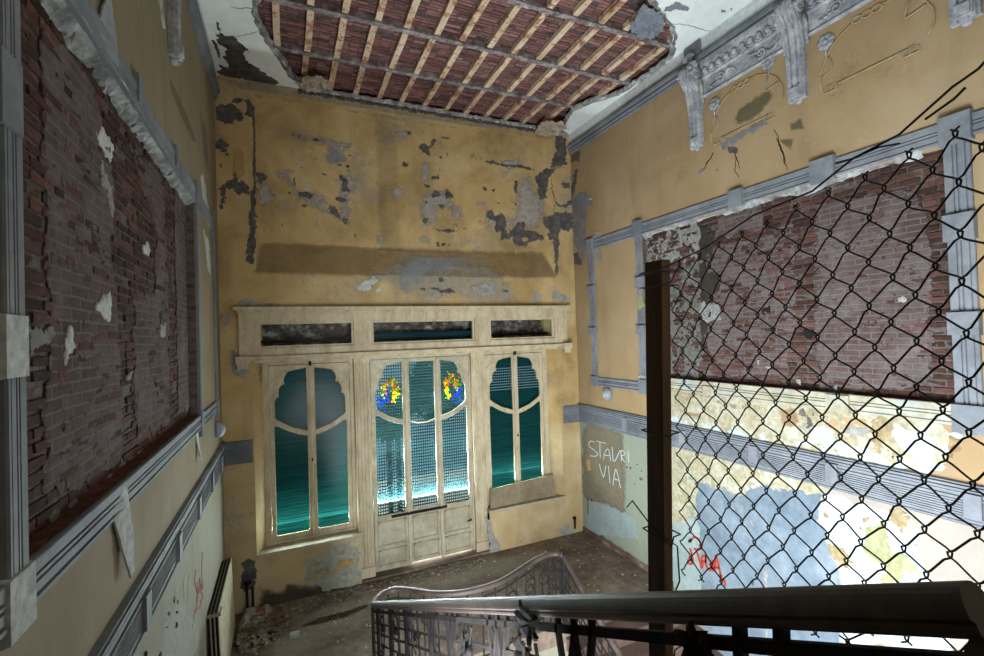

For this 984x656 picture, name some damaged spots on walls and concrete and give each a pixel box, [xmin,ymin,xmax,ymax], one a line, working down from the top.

crack [774,130,787,167]
flaking render [20,0,538,578]
flaking render [637,149,955,403]
peeling [671,391,966,474]
peeling [672,447,931,590]
peeling [304,539,362,592]
peeling [791,630,952,651]